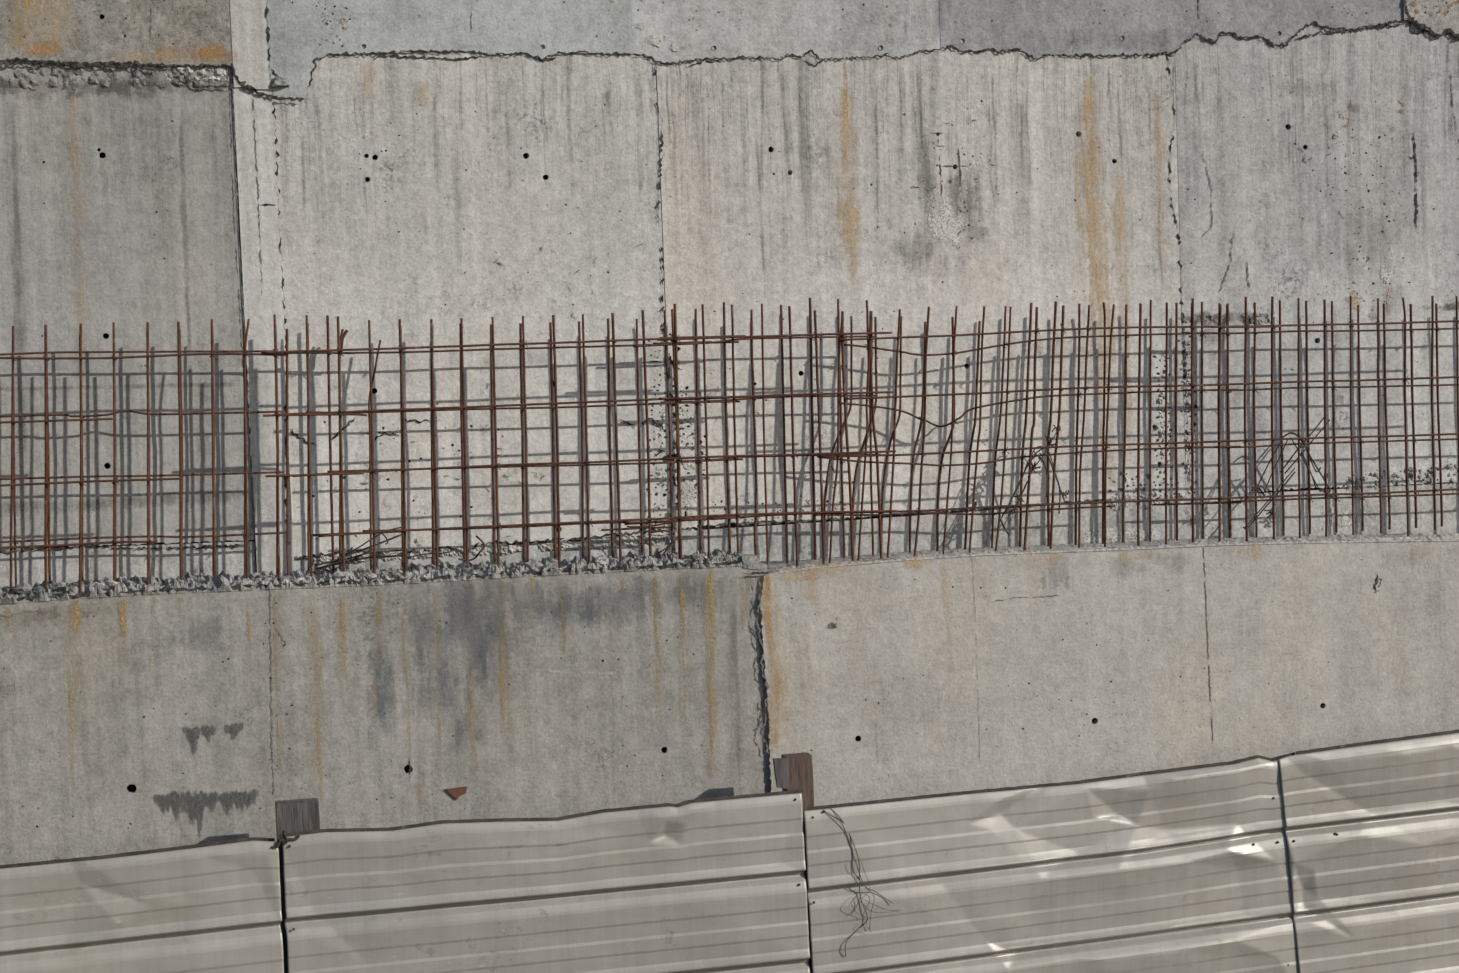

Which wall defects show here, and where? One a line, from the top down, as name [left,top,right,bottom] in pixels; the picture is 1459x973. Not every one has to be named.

crack [0,0,1459,559]
spalling [0,257,1459,604]
crack [0,560,770,795]
crack [972,562,1058,755]
crack [1203,546,1213,740]